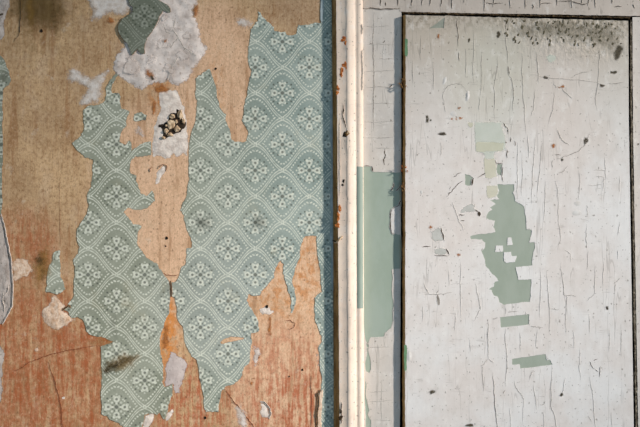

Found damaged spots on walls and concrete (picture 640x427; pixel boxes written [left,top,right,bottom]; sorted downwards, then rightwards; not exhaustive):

leakage [497,19,539,45]
leakage [535,20,623,60]
peeling [468,122,505,178]
peeling [0,0,322,427]
peeling [357,166,402,373]
crack [361,0,635,427]
peeling [470,184,535,305]
crack [14,345,100,427]
peeling [500,314,529,327]
peeling [512,354,552,368]